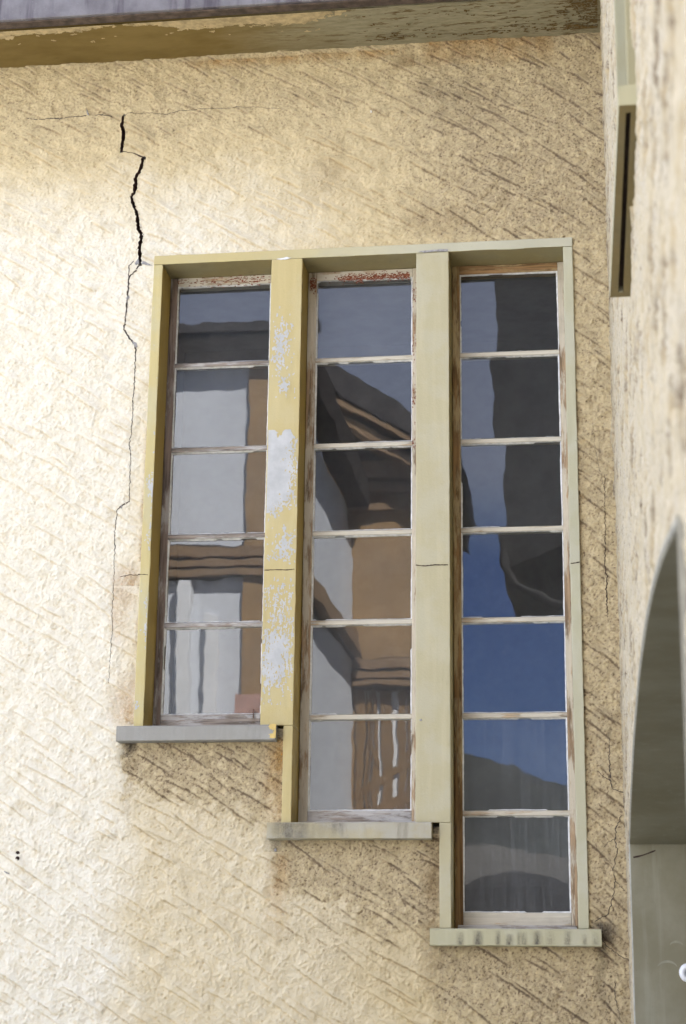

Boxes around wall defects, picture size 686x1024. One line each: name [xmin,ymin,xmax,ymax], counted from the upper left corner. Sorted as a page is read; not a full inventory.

crack [27,106,280,683]
peeling [270,306,296,399]
peeling [266,429,298,565]
peeling [261,577,294,705]
crack [596,739,655,961]